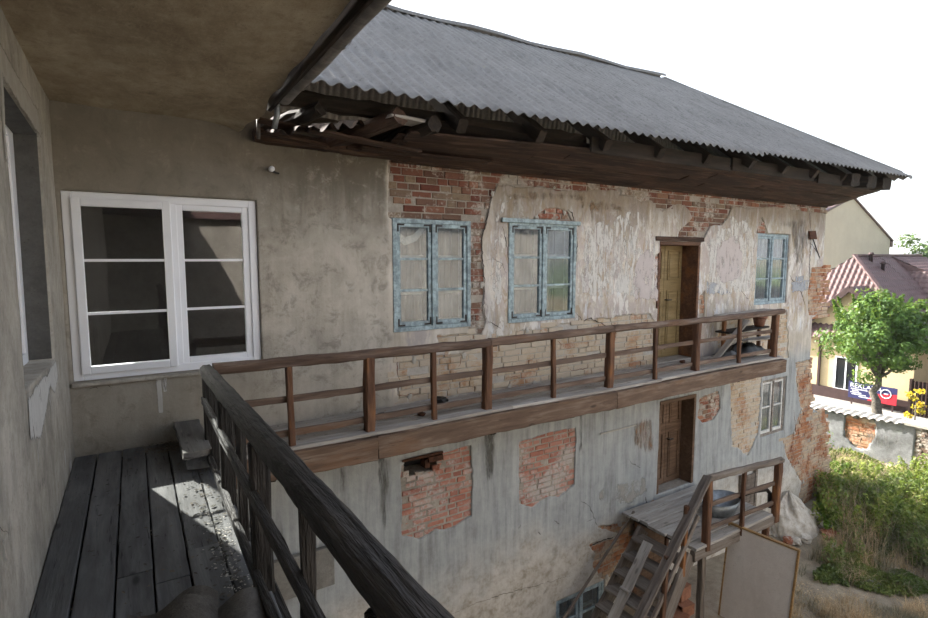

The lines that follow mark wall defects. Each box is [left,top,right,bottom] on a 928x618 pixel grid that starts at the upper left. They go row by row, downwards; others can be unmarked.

flaking render [387,160,831,404]
flaking render [400,446,472,539]
flaking render [519,428,576,507]
flaking render [697,377,761,455]
flaking render [717,307,831,503]
flaking render [845,415,876,449]
flaking render [913,427,928,470]